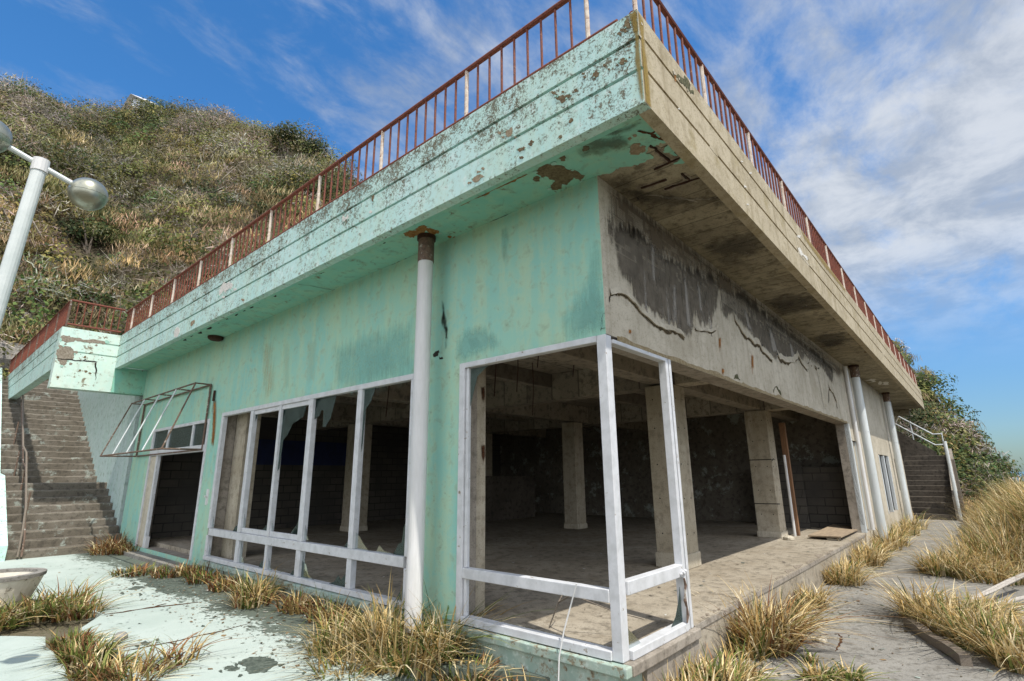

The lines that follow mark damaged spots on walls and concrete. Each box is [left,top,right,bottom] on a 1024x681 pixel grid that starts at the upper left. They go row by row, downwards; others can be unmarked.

peeling [617,18,646,40]
crack [637,130,664,141]
peeling [533,155,585,190]
water stain [608,184,844,384]
crack [600,287,812,372]
peeling [50,335,109,384]